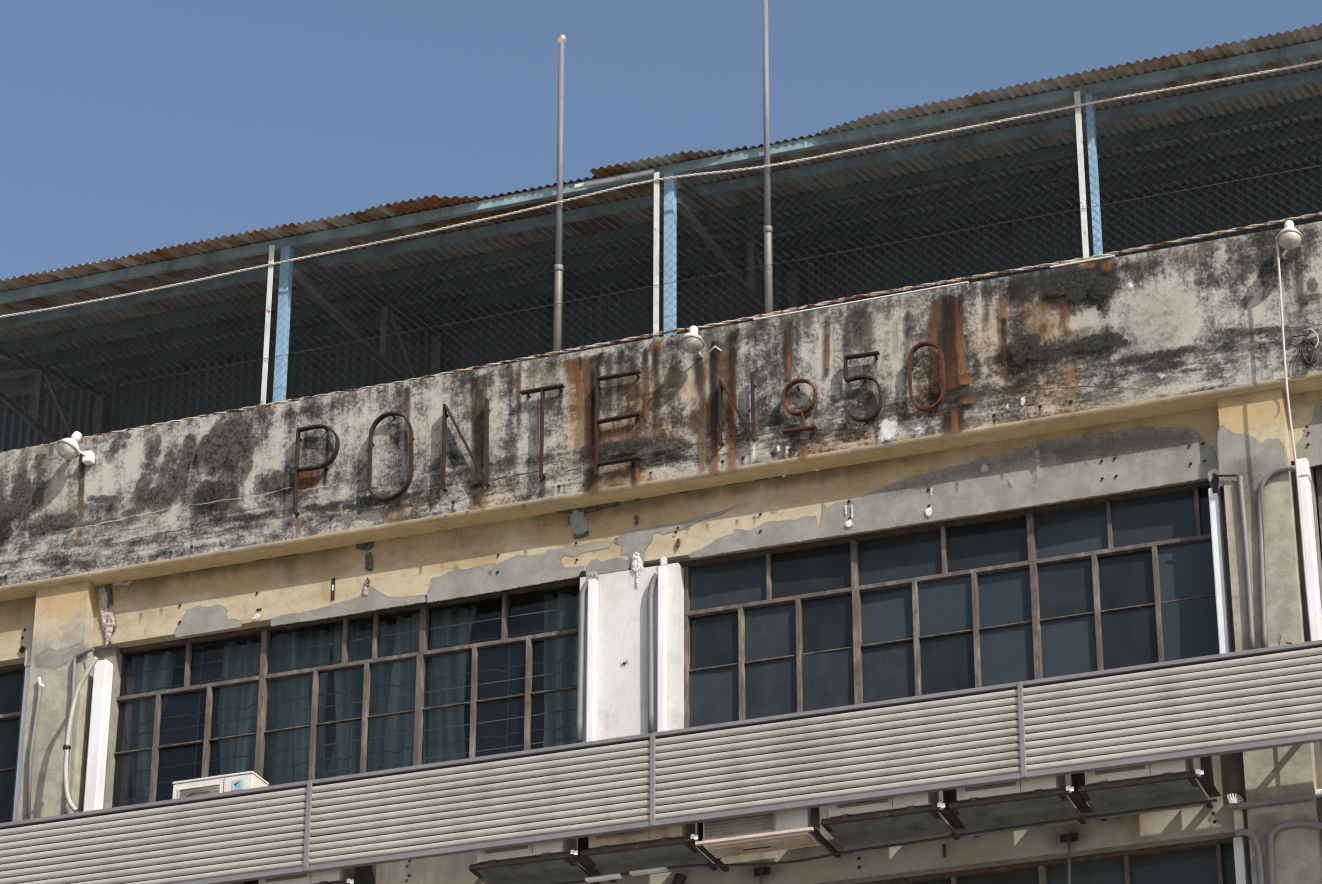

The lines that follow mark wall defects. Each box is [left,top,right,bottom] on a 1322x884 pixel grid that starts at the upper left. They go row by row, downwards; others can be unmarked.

corrosion [558,340,661,495]
corrosion [694,328,740,476]
corrosion [929,294,975,433]
damp [1040,267,1120,306]
damp [1010,329,1197,373]
damp [1221,325,1291,338]
damp [1289,247,1322,307]
damp [0,421,275,542]
peeling [270,399,1322,626]
peeling [175,605,242,637]